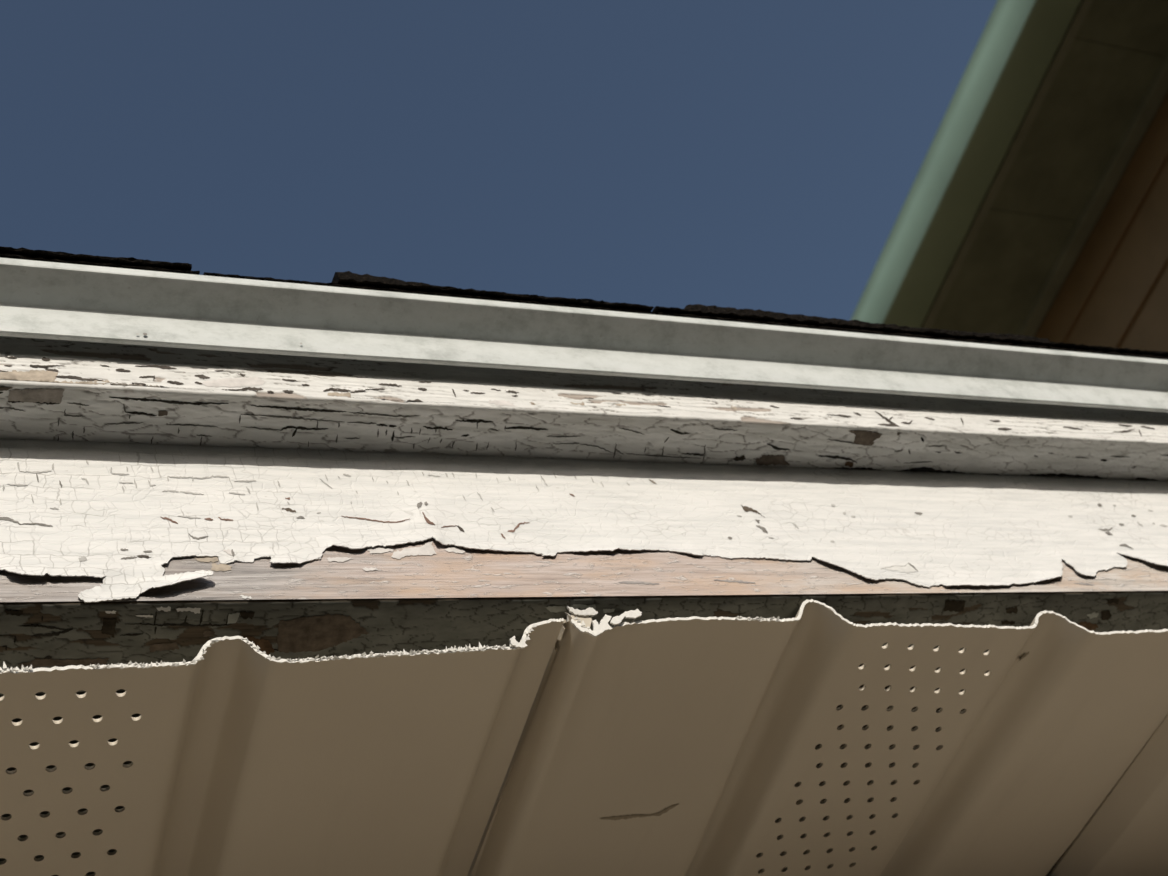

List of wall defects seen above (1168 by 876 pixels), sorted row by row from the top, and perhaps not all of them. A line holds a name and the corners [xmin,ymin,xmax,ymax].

peeling [0,370,159,403]
peeling [202,376,266,391]
peeling [849,430,882,446]
crack [0,356,738,556]
peeling [733,455,790,466]
peeling [737,505,773,539]
crack [120,549,152,559]
peeling [0,570,103,616]
peeling [101,515,1168,638]
peeling [243,614,368,655]
peeling [18,658,109,667]